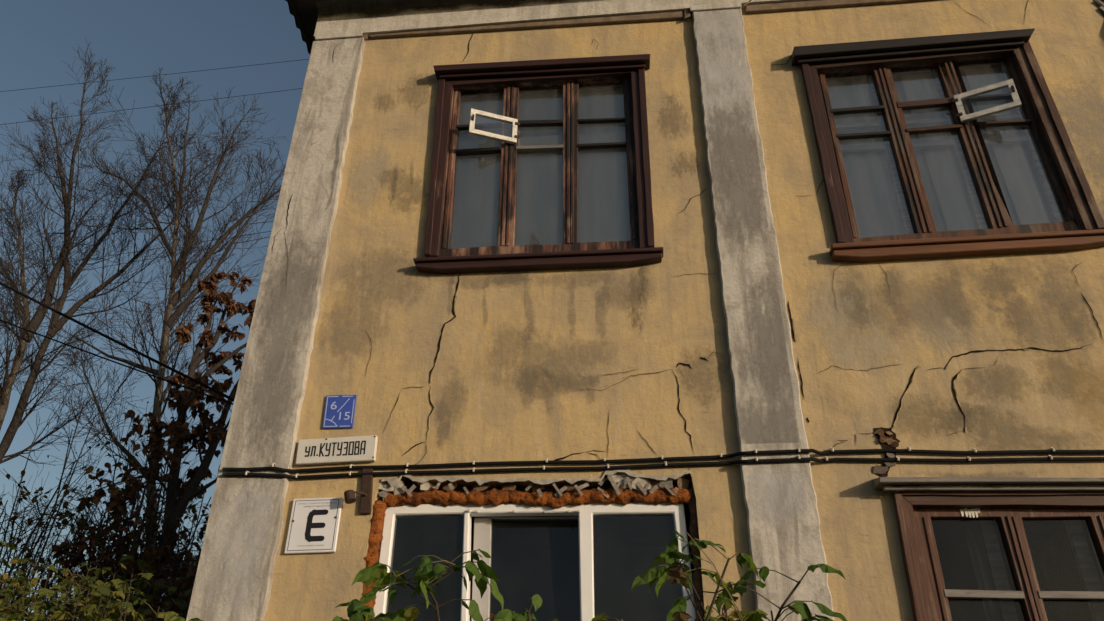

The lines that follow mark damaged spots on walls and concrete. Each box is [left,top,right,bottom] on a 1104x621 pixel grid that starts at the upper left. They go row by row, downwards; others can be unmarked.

crack [382,274,461,465]
crack [544,352,723,470]
crack [788,262,1104,436]